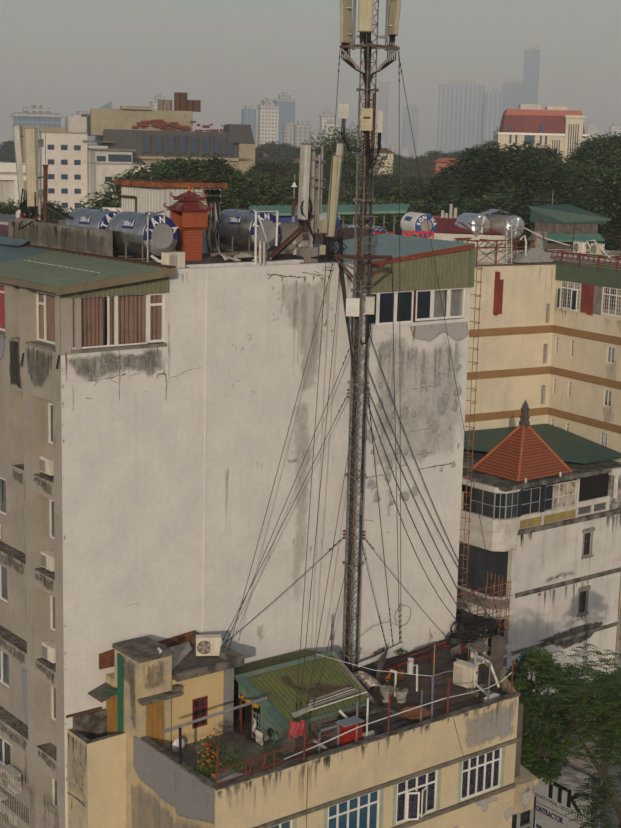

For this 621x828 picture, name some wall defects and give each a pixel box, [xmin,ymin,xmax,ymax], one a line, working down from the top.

crack [267,266,334,282]
water stain [10,341,49,387]
water stain [69,350,160,379]
crack [66,352,196,404]